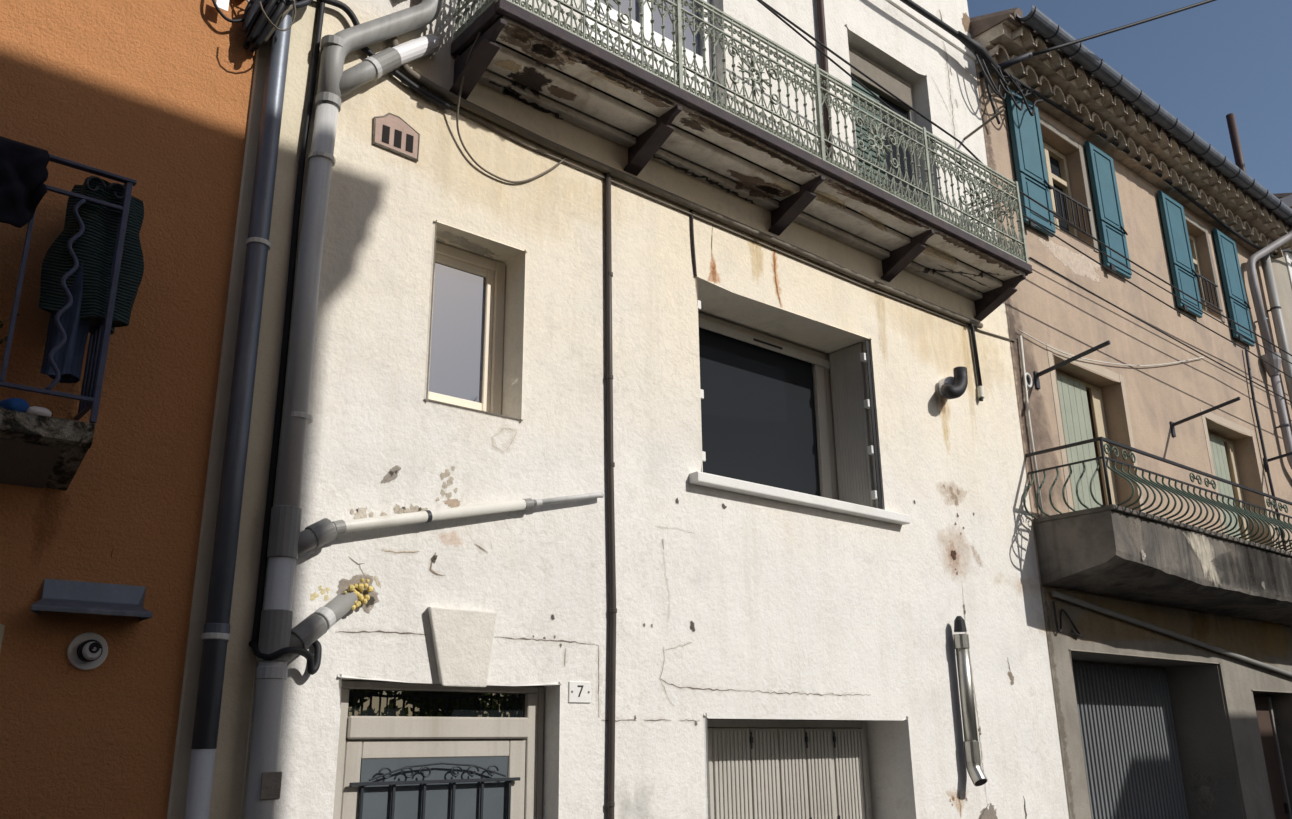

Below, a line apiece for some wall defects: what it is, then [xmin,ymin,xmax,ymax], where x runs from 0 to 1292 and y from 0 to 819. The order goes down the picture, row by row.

peeling [351,465,460,519]
crack [502,635,869,726]